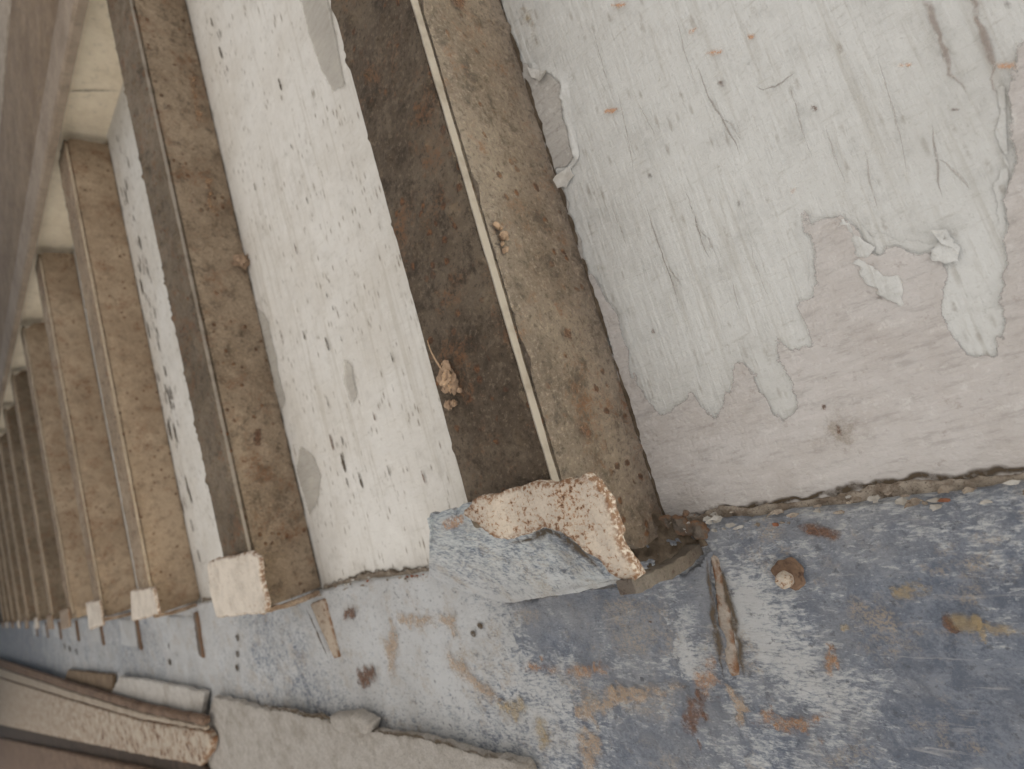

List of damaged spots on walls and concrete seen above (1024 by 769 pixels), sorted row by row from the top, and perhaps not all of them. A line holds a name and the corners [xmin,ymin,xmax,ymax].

peeling [522,42,1024,516]
crack [669,466,1024,533]
corrosion [943,615,1014,639]
corrosion [356,666,376,688]